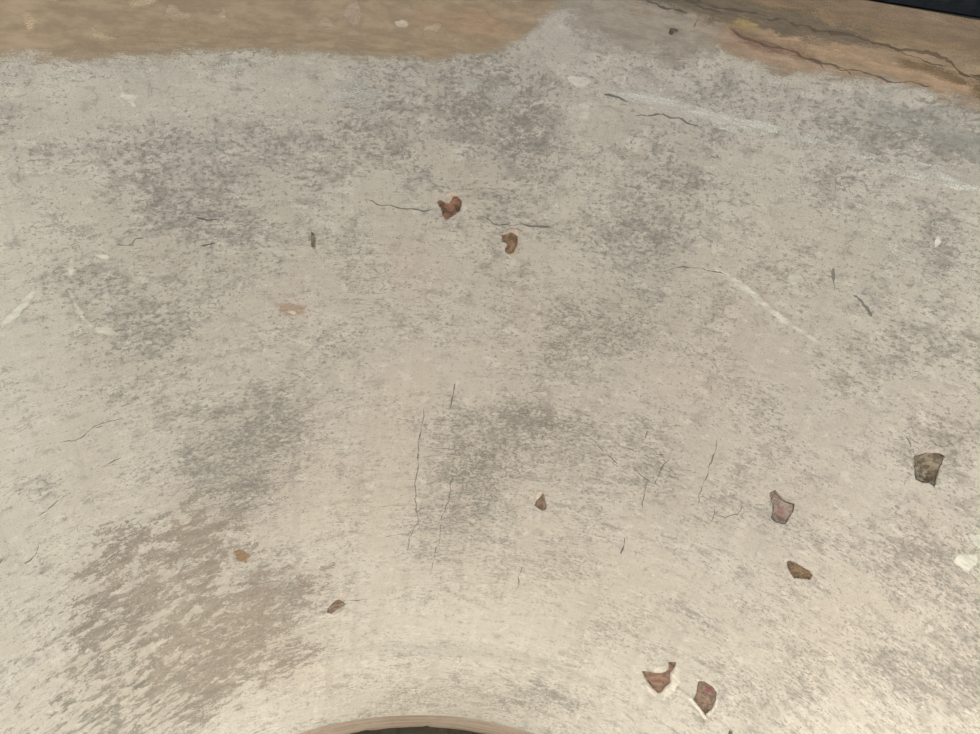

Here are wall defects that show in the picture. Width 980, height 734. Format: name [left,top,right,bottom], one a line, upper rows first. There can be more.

crack [646,0,980,87]
leakage [0,0,980,211]
crack [386,407,454,571]
spalling [639,660,681,701]
spalling [688,678,718,720]